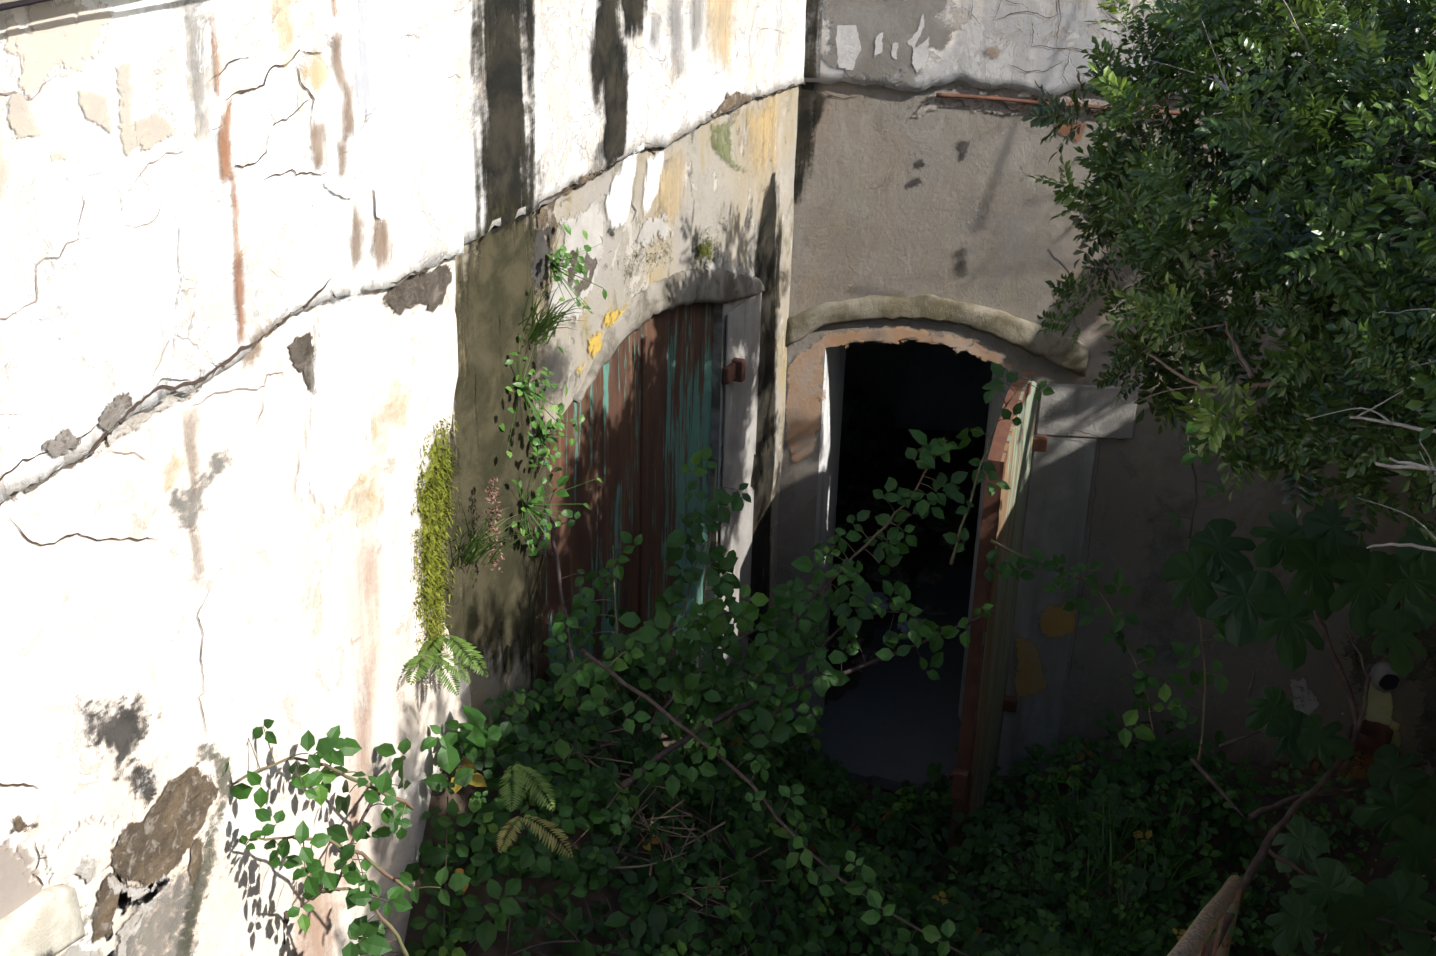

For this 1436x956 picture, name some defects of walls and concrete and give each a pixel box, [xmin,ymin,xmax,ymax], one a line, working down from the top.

spalling [0,385,203,507]
crack [0,35,339,546]
rust [212,13,245,341]
spalling [288,332,317,397]
spalling [383,264,452,315]
crack [391,255,455,283]
leakage [435,0,568,679]
peeling [536,170,607,325]
leakage [591,0,731,236]
leakage [747,0,831,684]
spalling [0,750,219,956]
mould [77,692,163,809]